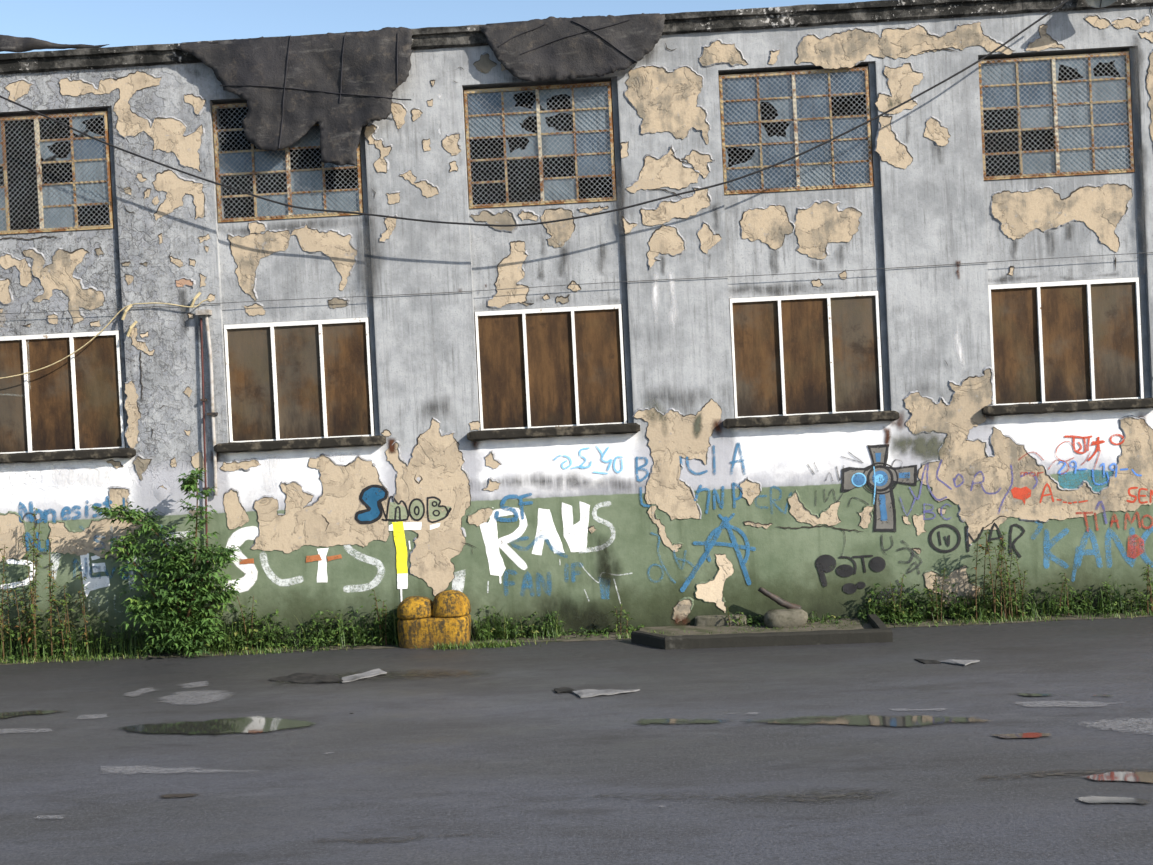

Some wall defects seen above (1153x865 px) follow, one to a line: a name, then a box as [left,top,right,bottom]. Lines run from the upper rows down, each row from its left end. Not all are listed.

flaking render [0,247,106,328]
peeling [58,71,207,220]
flaking render [227,220,358,316]
peeling [469,205,609,310]
flaking render [620,38,749,270]
flaking render [739,199,862,259]
flaking render [795,21,1065,169]
flaking render [989,182,1133,252]
peeling [0,511,27,562]
peeling [220,417,502,596]
peeling [632,398,722,552]
flaking render [902,366,1153,554]